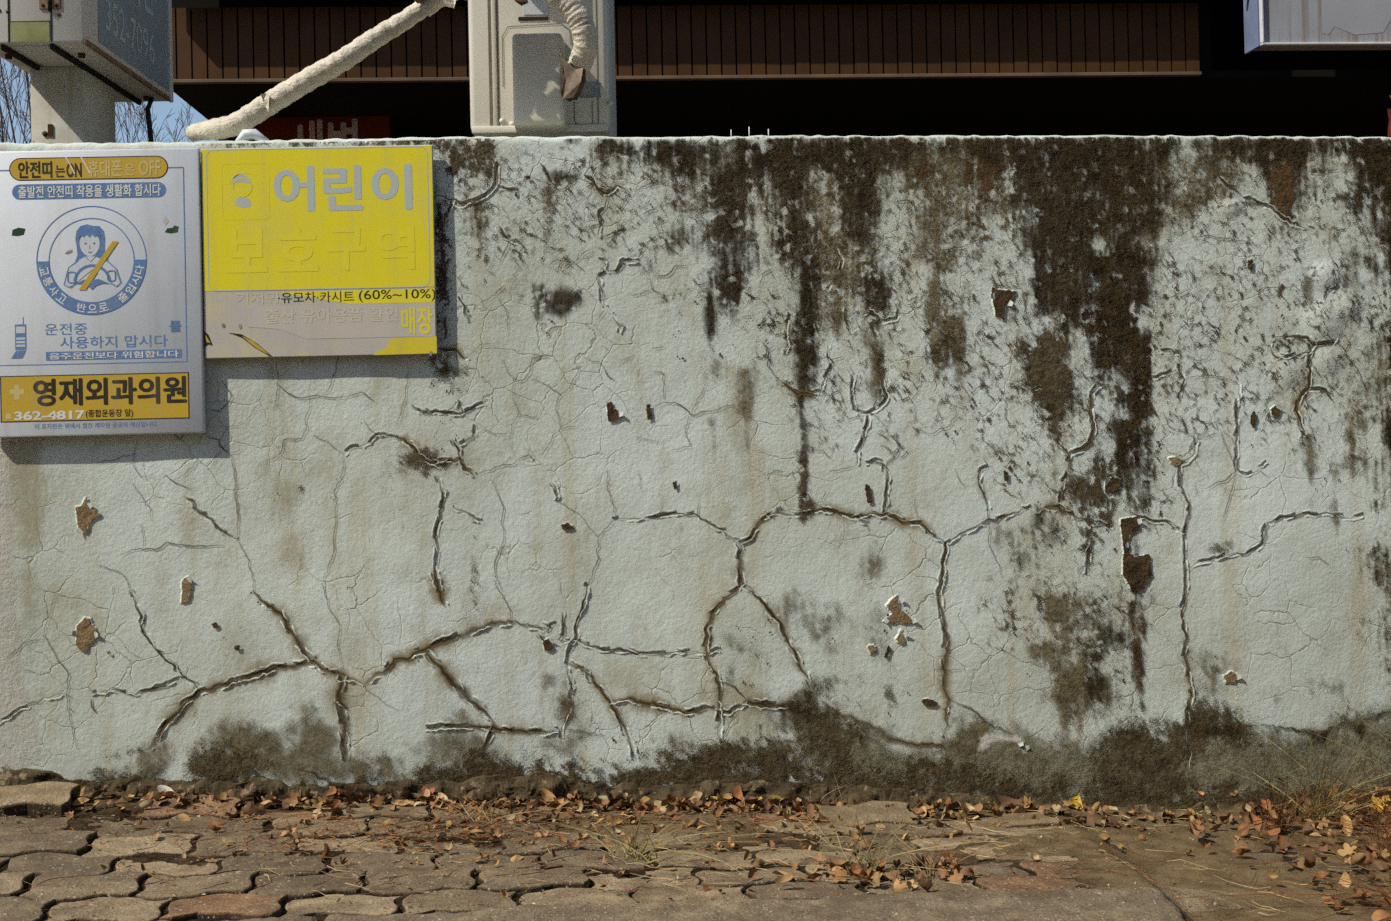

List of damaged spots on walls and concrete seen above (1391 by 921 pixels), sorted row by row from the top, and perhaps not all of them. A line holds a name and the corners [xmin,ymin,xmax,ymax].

leakage [521,285,582,319]
peeling [991,287,1017,322]
leakage [597,136,1391,561]
crack [0,136,1391,800]
peeling [74,496,102,535]
peeling [989,424,1161,598]
peeling [72,616,111,655]
peeling [180,575,193,604]
peeling [866,594,917,659]
leakage [654,526,1292,802]
leakage [1367,545,1391,640]
leakage [106,705,506,789]